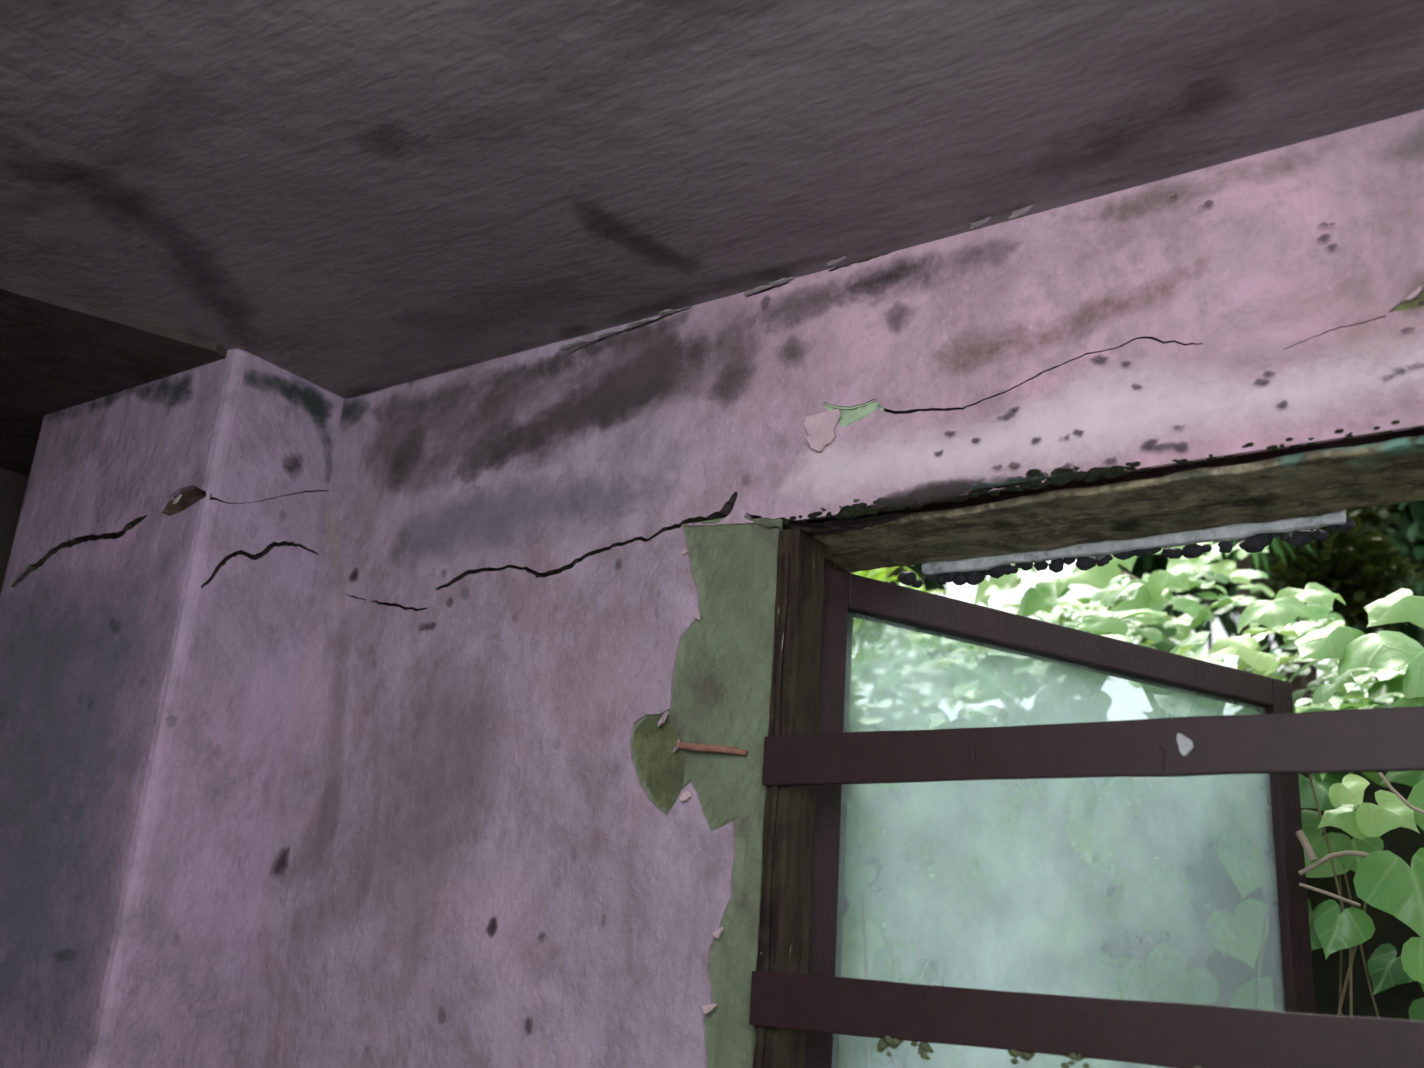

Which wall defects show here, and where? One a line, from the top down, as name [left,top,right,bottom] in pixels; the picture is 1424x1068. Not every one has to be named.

spalling [1392,285,1424,312]
crack [877,337,1203,414]
water stain [1091,355,1130,366]
water stain [378,326,746,481]
spalling [804,399,884,452]
water stain [1141,425,1187,451]
crack [210,490,329,504]
water stain [877,462,1033,507]
crack [11,515,147,588]
crack [201,541,318,588]
crack [347,492,906,612]
spalling [631,518,783,1068]